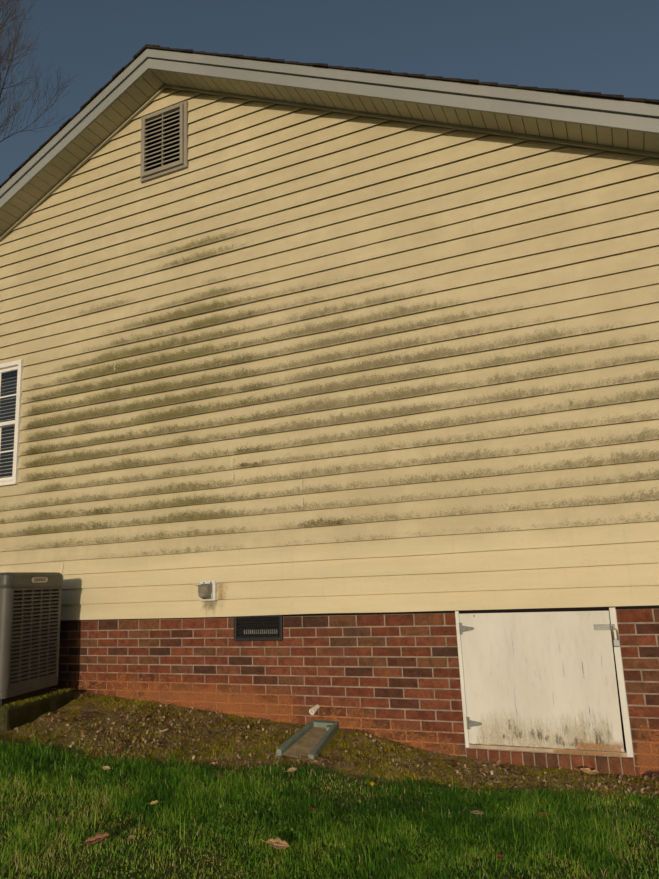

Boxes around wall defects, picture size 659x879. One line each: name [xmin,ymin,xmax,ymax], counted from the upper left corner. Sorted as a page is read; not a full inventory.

leakage [1,280,580,548]